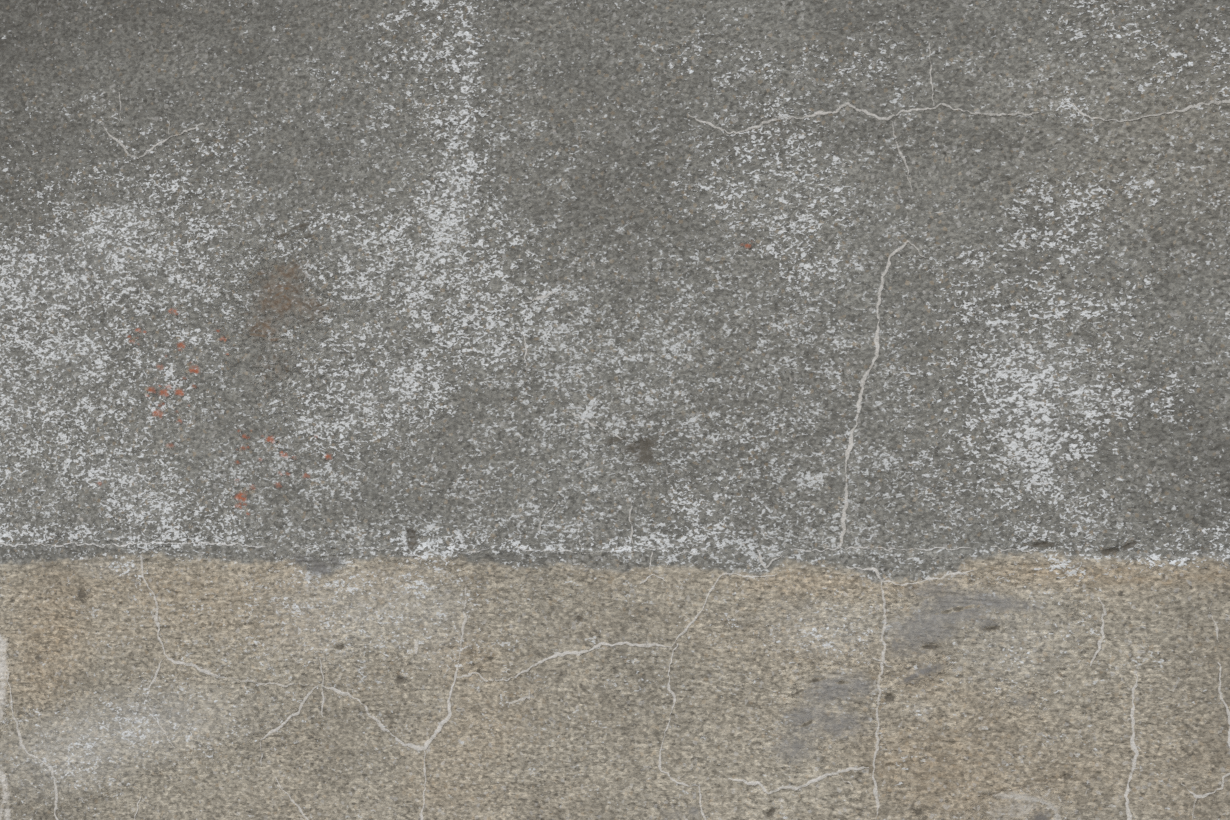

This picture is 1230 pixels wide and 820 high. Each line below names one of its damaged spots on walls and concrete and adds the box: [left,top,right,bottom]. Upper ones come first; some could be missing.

corrosion [233,249,338,401]
crack [0,240,1050,820]
crack [1090,597,1107,666]
crack [1124,673,1139,820]
crack [1181,598,1230,820]